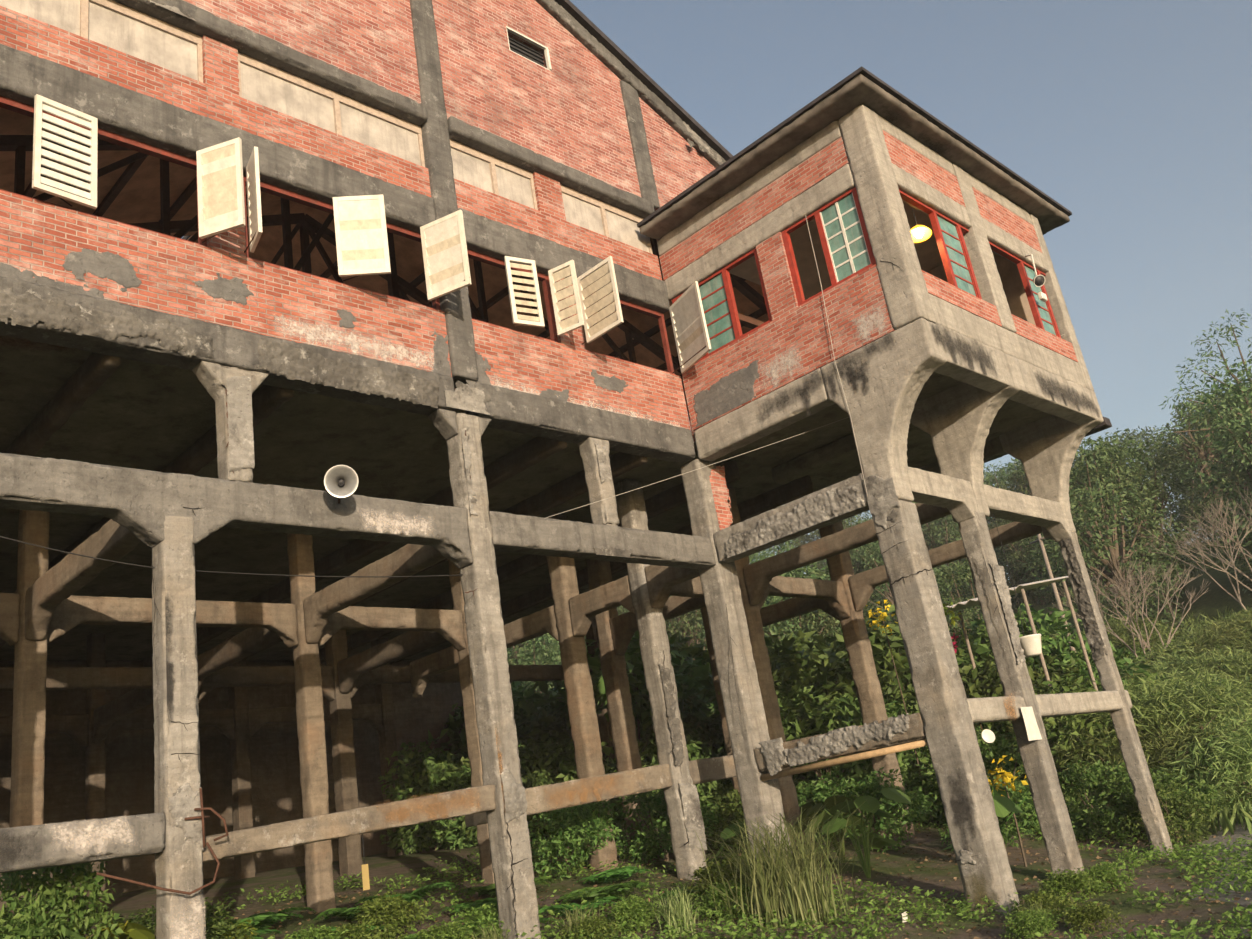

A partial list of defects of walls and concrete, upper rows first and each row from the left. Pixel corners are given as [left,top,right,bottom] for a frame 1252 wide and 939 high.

spalling [0,267,216,360]
leakage [932,326,996,375]
spalling [782,713,909,766]
leakage [949,776,974,851]
crack [504,799,528,938]